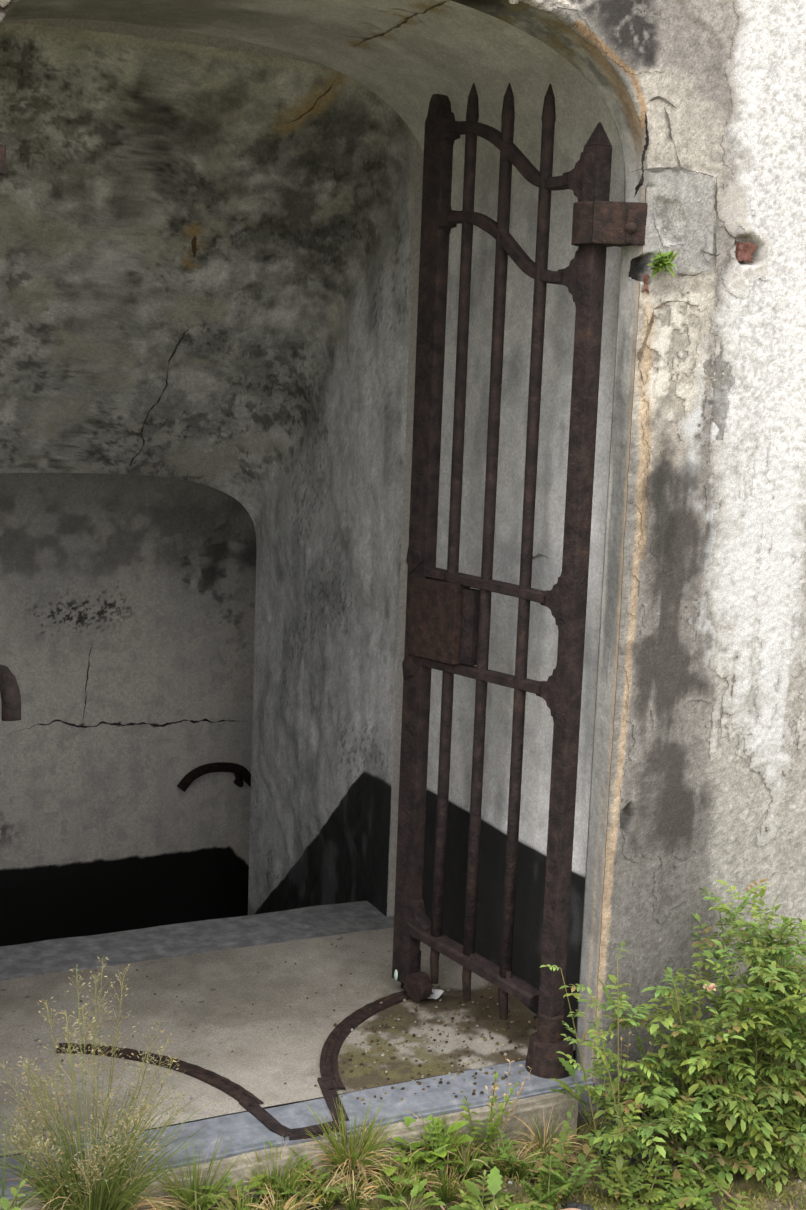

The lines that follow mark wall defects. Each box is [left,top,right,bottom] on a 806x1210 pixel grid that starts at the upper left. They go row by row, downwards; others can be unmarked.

spalling [0,0,19,22]
spalling [508,0,598,11]
leakage [0,67,261,172]
leakage [246,157,385,320]
crack [124,327,190,472]
leakage [618,0,806,924]
crack [18,642,245,731]